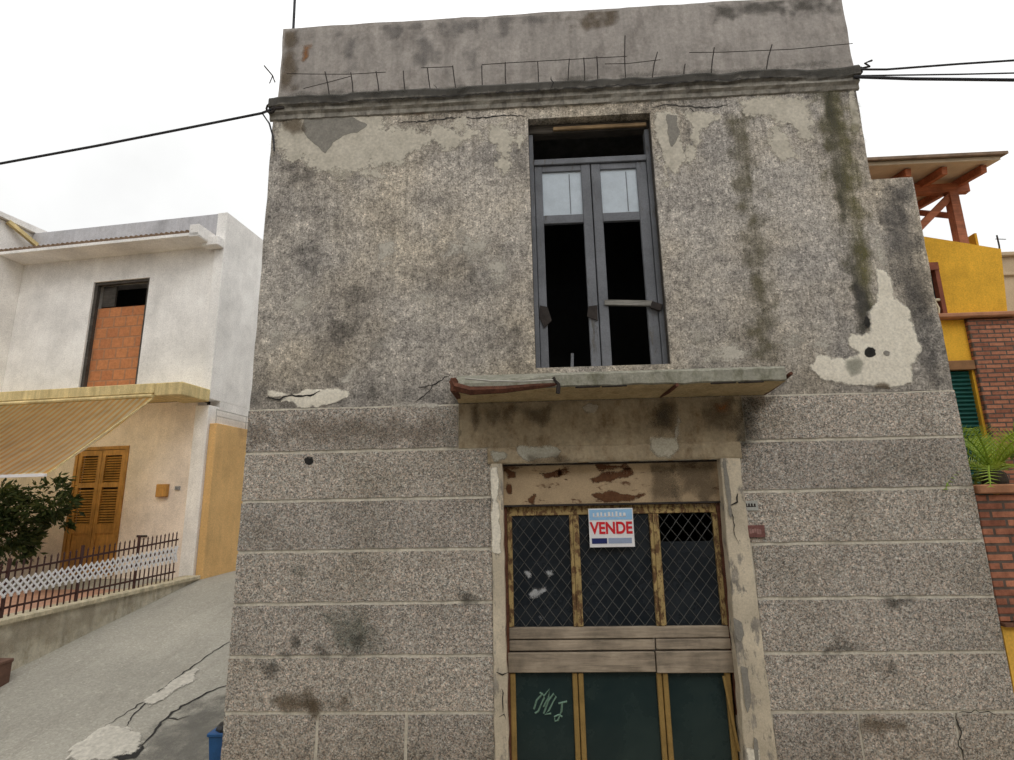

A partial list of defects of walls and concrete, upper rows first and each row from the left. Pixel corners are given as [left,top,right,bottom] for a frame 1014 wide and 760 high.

peeling [272,115,526,184]
peeling [791,235,922,388]
peeling [267,369,356,408]
crack [106,642,229,745]
water stain [276,695,319,712]